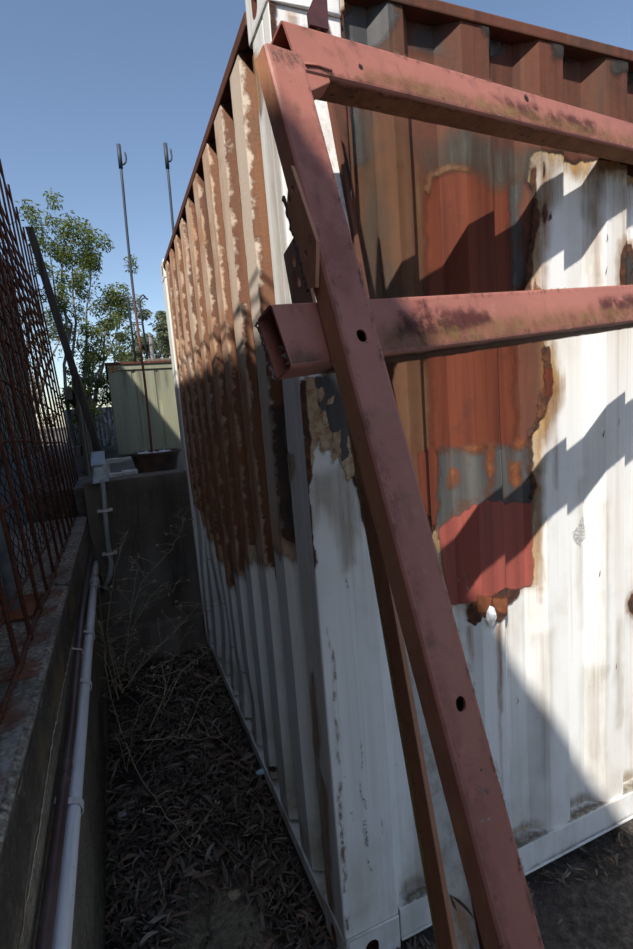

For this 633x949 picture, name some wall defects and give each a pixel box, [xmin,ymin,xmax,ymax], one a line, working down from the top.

corrosion [323,2,633,123]
corrosion [317,81,633,299]
peeling [526,162,552,290]
corrosion [165,51,297,593]
peeling [304,373,355,481]
corrosion [384,323,633,534]
peeling [526,346,553,498]
peeling [477,595,508,614]
corrosion [310,674,346,914]